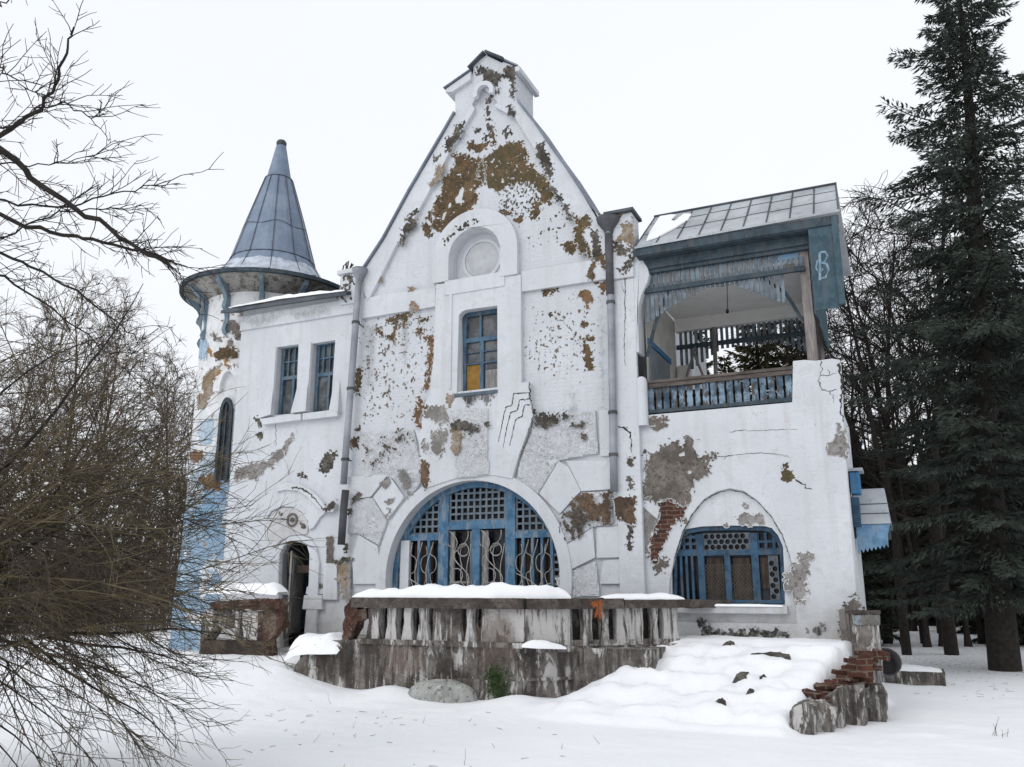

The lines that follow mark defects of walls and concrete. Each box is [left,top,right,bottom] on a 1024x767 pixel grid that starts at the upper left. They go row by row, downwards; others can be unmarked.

peeling [397,63,638,386]
peeling [182,320,295,542]
peeling [297,449,338,479]
peeling [350,286,490,518]
spalling [531,409,587,440]
crack [818,361,844,422]
peeling [825,422,851,460]
peeling [559,414,719,576]
peeling [723,501,766,528]
peeling [782,550,816,606]
corrosion [590,600,604,623]